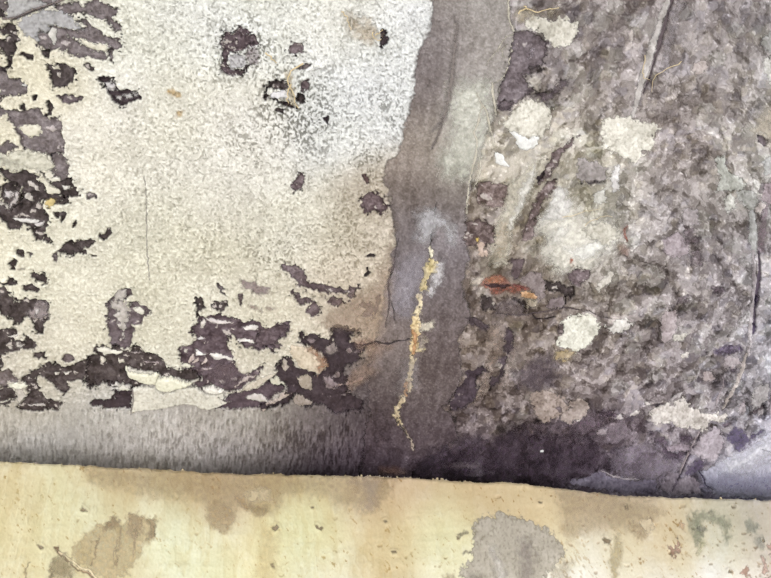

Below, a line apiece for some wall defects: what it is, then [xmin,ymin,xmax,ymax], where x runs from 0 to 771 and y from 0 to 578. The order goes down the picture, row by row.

spalling [219,25,259,77]
spalling [366,28,389,48]
spalling [263,74,310,113]
peeling [0,0,142,262]
damp [443,81,490,178]
spalling [358,174,390,215]
rust [471,274,538,307]
spalling [0,249,381,414]
crack [363,206,453,451]
damp [413,411,705,488]
damp [209,482,278,532]
damp [49,557,74,578]